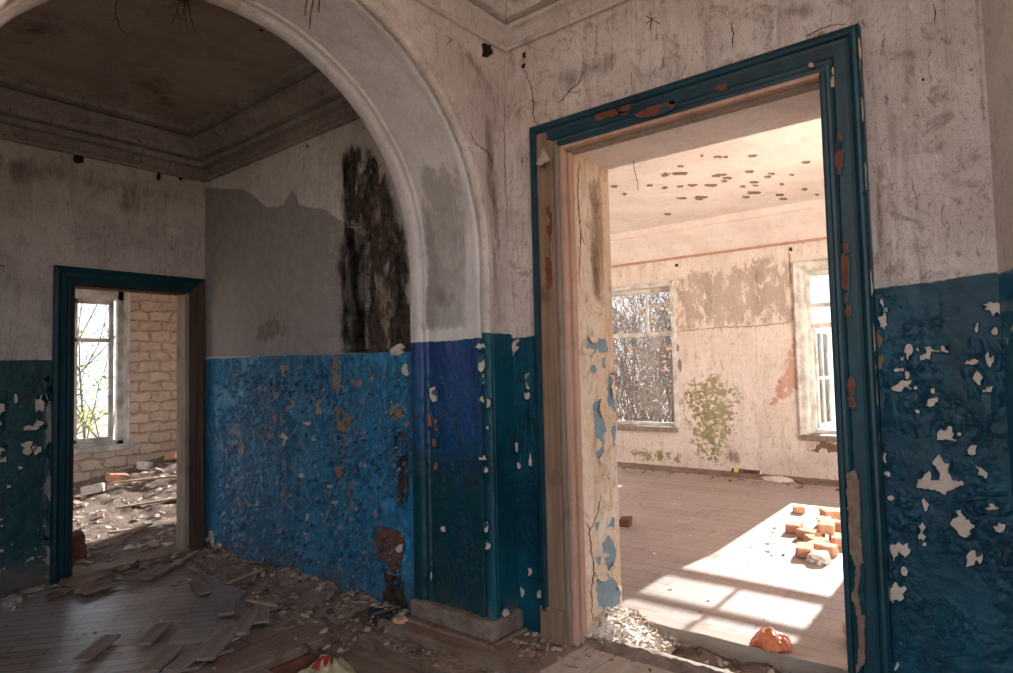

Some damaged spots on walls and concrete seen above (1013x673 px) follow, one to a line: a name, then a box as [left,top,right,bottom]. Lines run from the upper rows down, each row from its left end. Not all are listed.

peeling [647,165,794,200]
flaking render [0,375,52,577]
leakage [205,158,400,357]
peeling [205,344,440,592]
peeling [586,336,618,486]
peeling [595,517,622,612]
leakage [691,391,714,458]
flaking render [674,259,794,328]
peeling [868,268,950,415]
peeling [888,424,989,605]
peeling [963,300,1013,394]
peeling [985,501,1007,534]